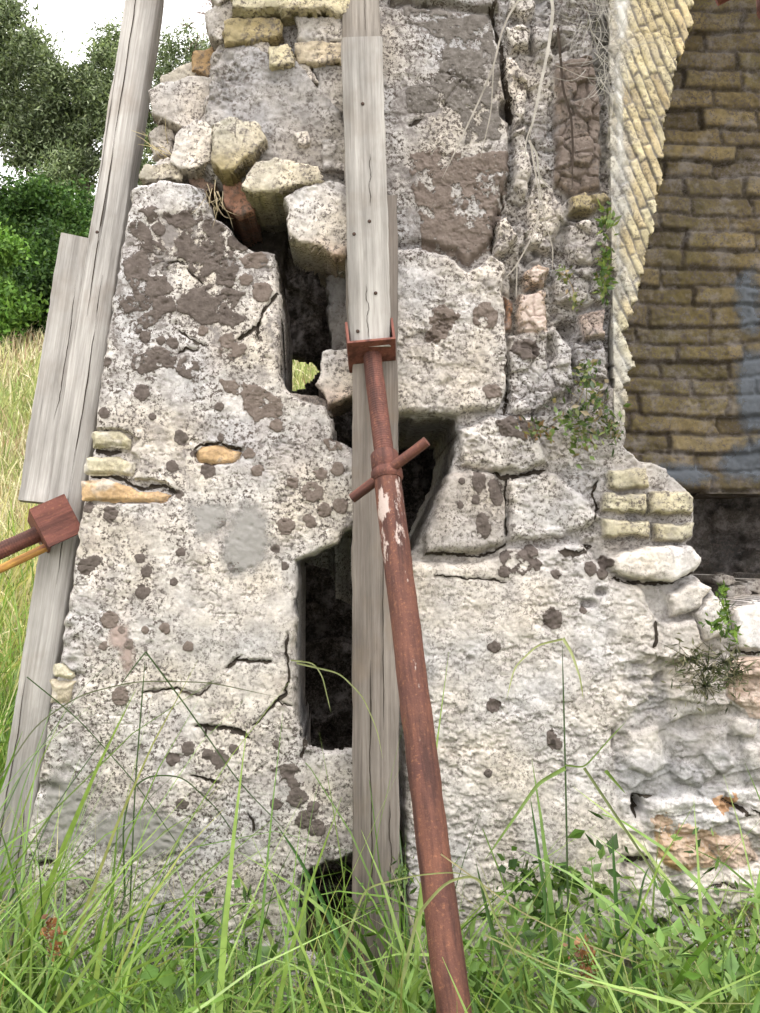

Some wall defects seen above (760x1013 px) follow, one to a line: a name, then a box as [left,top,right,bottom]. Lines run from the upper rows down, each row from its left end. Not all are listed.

crack [488,0,514,126]
crack [238,293,280,341]
crack [143,634,291,738]